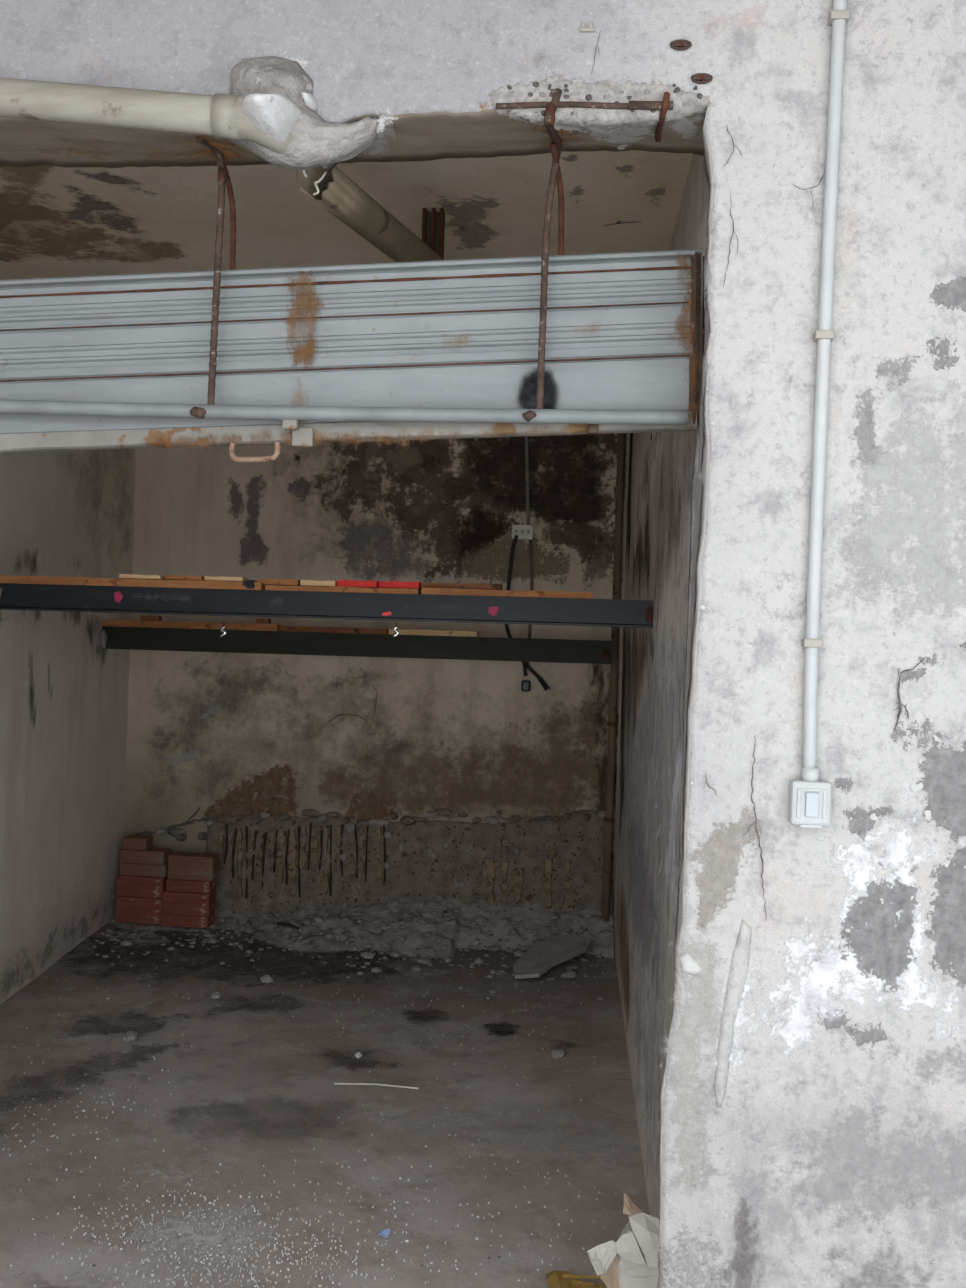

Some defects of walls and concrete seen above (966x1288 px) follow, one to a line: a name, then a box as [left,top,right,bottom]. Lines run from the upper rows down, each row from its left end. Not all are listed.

leakage [0,165,184,262]
spalling [488,73,712,409]
leakage [229,477,269,566]
leakage [288,432,690,598]
leakage [319,609,962,1187]
crack [742,735,767,920]